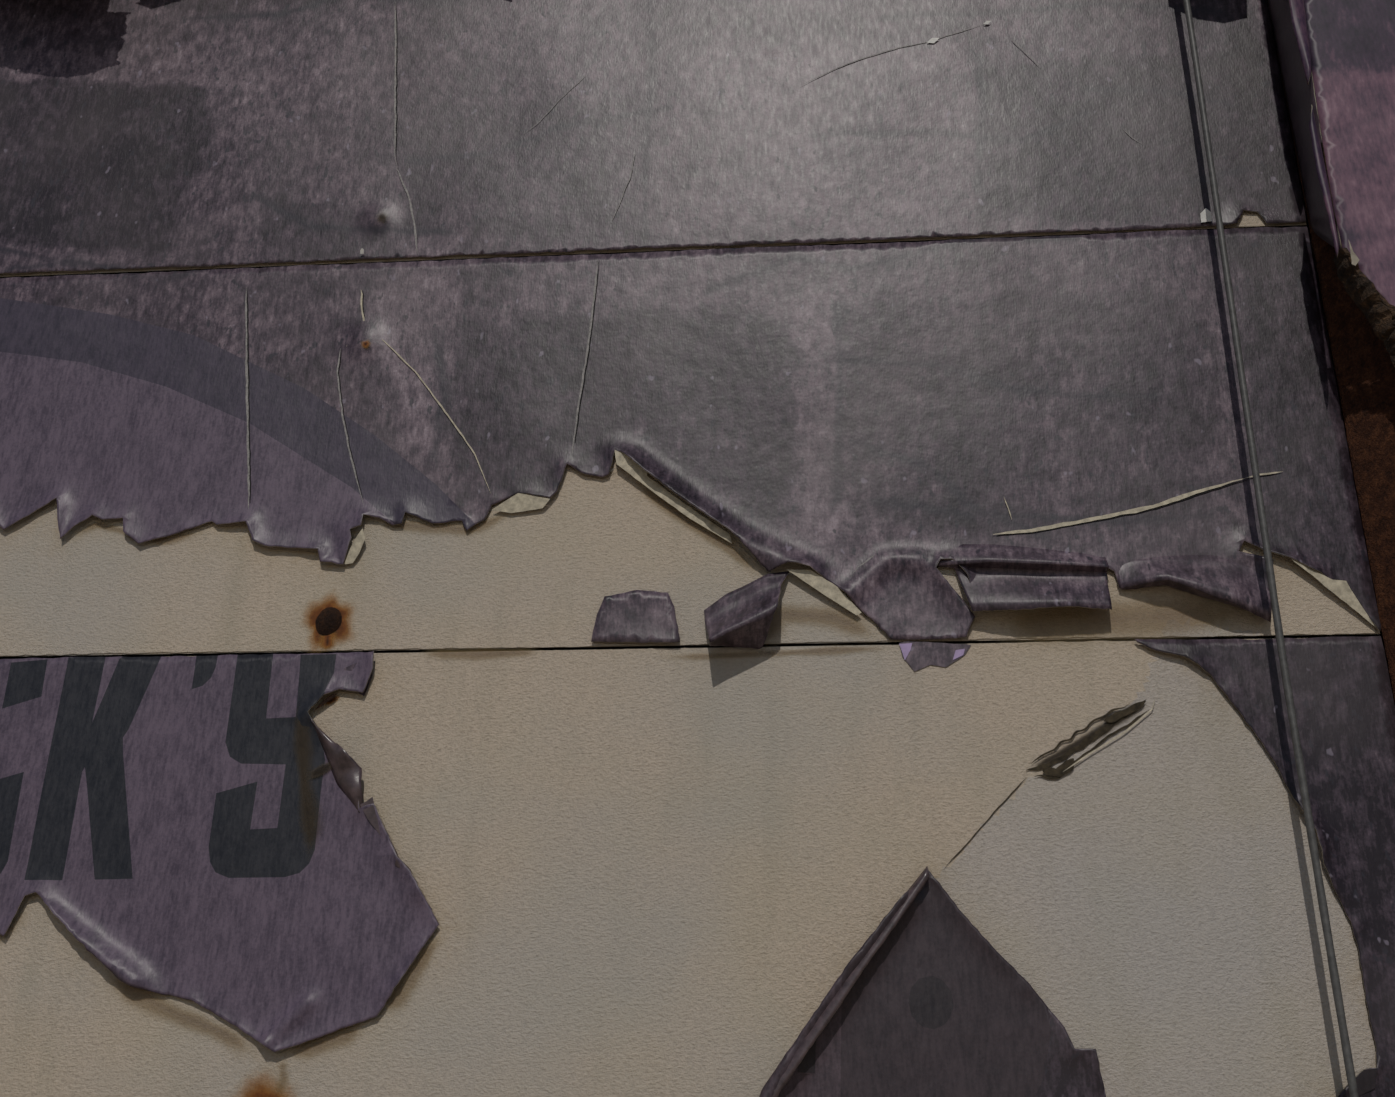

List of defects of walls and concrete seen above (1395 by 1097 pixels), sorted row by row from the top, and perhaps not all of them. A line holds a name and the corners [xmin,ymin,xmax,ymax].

peeling [1200,208,1212,222]
rust [1333,239,1395,367]
rust [307,598,350,649]
peeling [0,458,1377,1097]
rust [243,1079,287,1097]